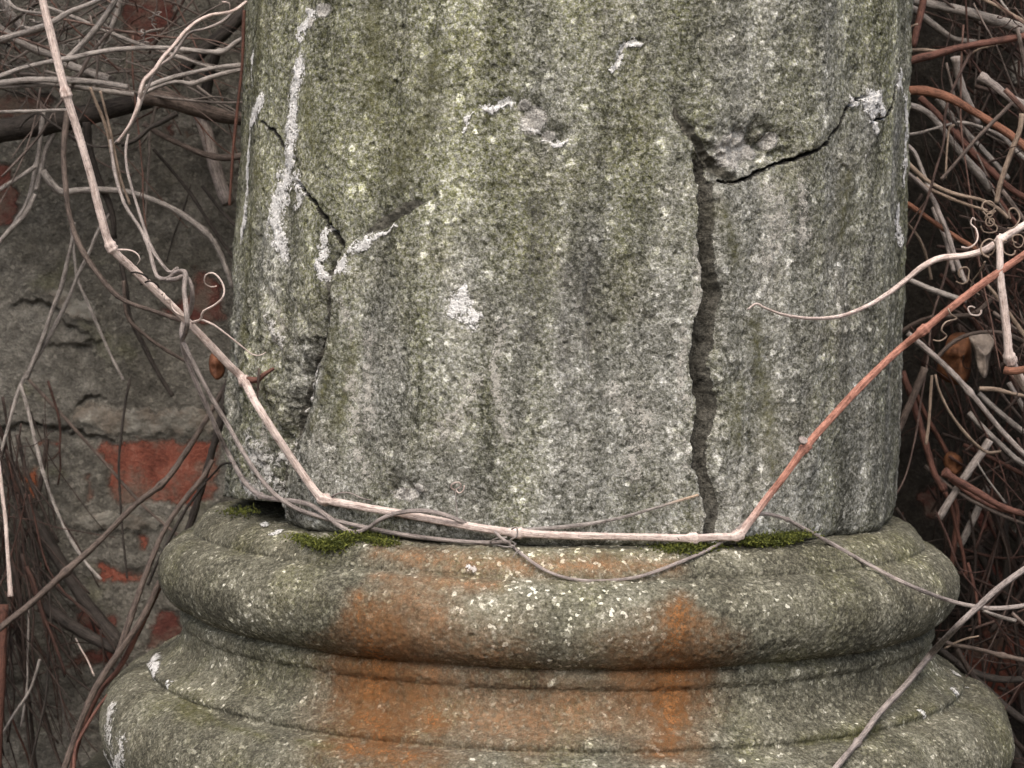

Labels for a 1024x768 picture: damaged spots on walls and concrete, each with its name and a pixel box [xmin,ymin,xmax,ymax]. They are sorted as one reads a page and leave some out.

crack [260,120,286,148]
crack [280,184,424,498]
crack [673,81,898,544]
corrosion [650,598,702,758]